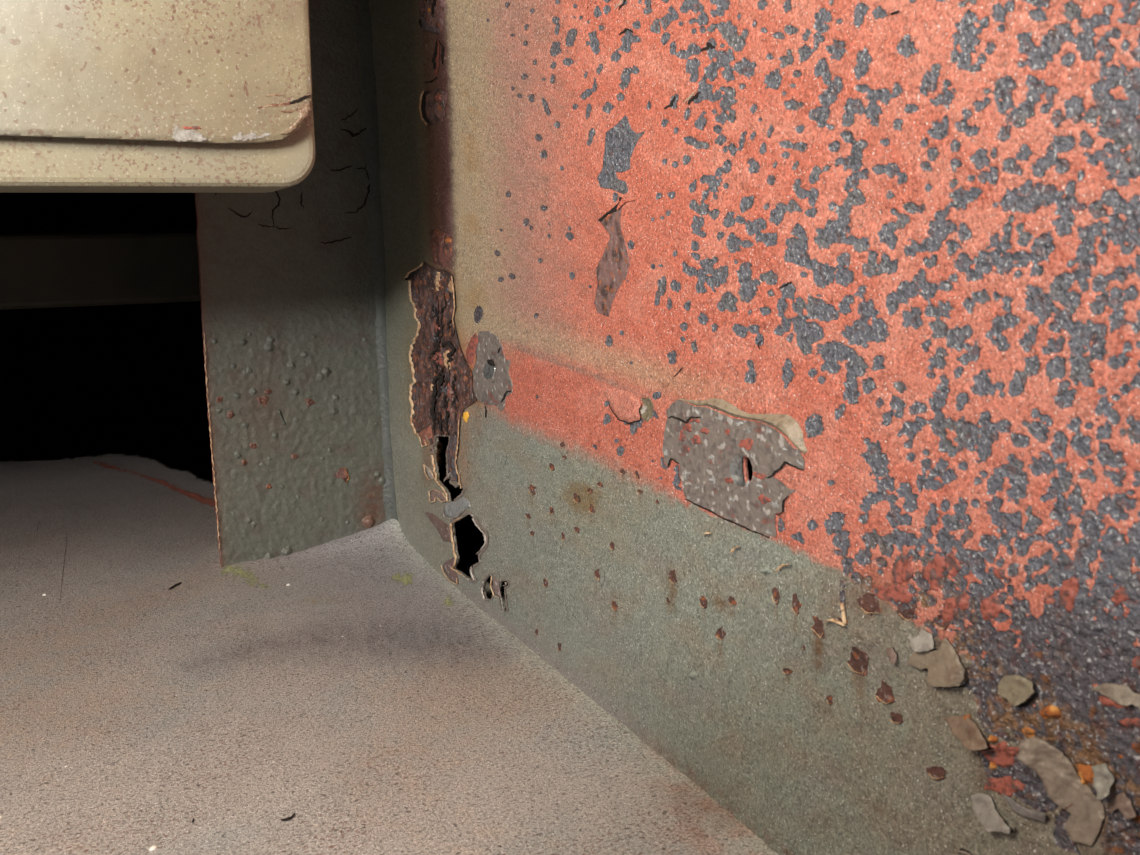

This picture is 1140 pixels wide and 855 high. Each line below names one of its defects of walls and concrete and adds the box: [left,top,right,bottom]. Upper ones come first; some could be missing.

crack [215,191,304,230]
crack [321,165,370,244]
spalling [511,0,1127,544]
rust [404,229,476,489]
peeling [1107,332,1132,370]
peeling [423,464,471,543]
rust [573,482,604,513]
peeling [490,576,501,598]
peeling [995,557,1019,577]
peeling [886,614,969,688]
peeling [997,675,1038,708]
peeling [943,715,1137,855]